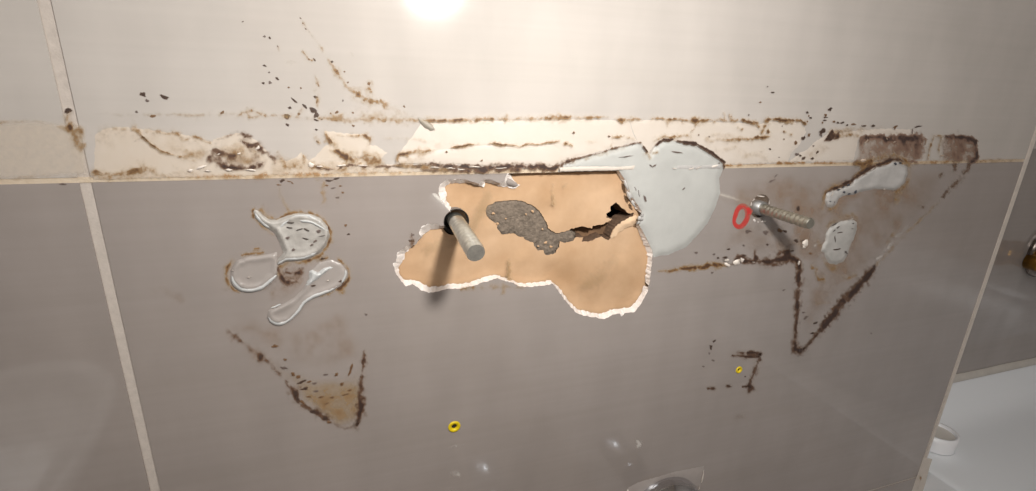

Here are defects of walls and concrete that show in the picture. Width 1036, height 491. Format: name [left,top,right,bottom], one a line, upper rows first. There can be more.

peeling [418,117,435,131]
water stain [413,115,572,123]
peeling [324,131,387,167]
spalling [393,166,653,319]
water stain [617,107,984,355]